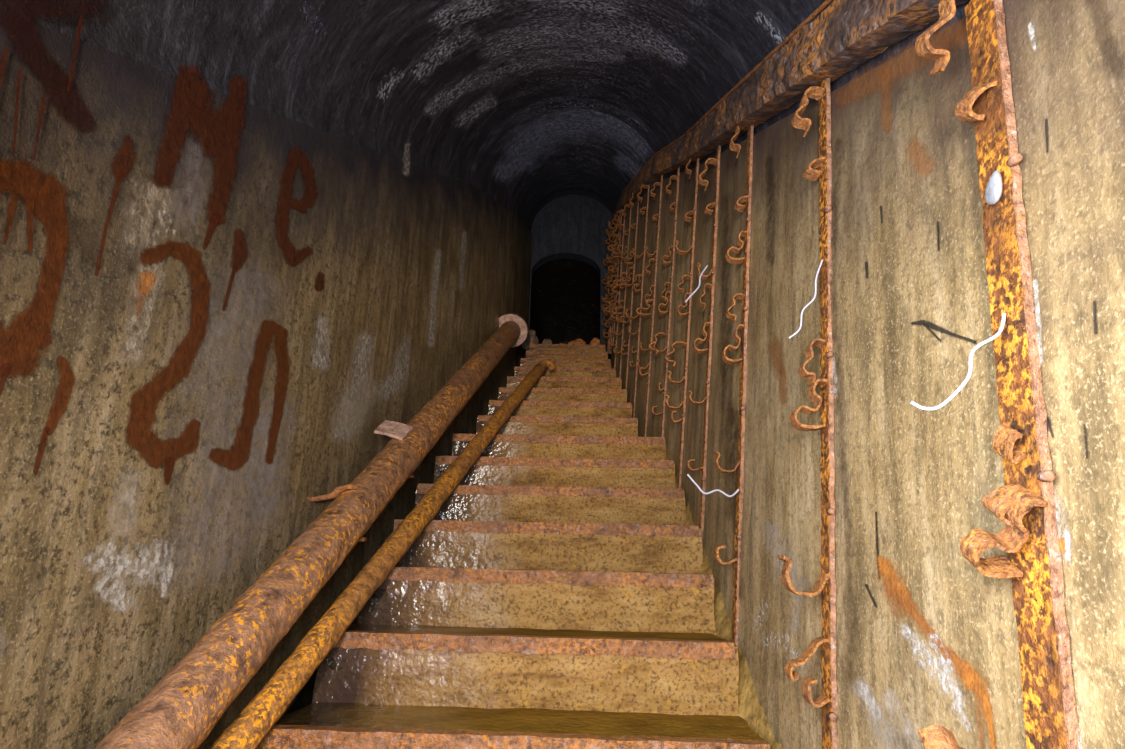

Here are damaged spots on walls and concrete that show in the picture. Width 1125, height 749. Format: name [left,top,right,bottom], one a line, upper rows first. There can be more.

water stain [89,477,173,611]
rust [877,556,996,749]